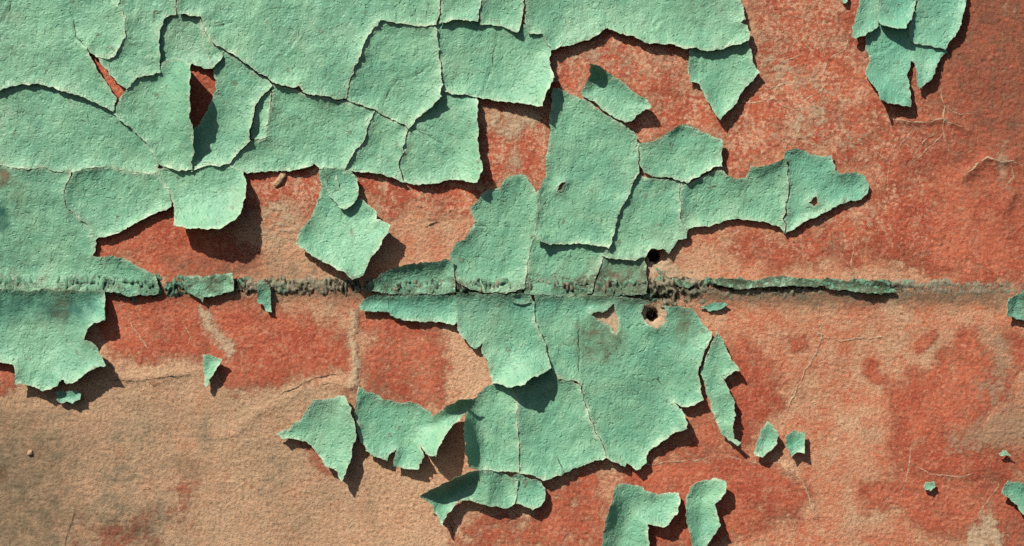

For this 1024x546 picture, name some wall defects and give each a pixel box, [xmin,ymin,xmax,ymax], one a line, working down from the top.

crack [203,21,444,171]
peeling [0,0,1024,396]
peeling [55,390,81,404]
peeling [277,395,357,482]
peeling [346,292,712,481]
peeling [420,331,813,546]
peeling [859,324,1024,546]